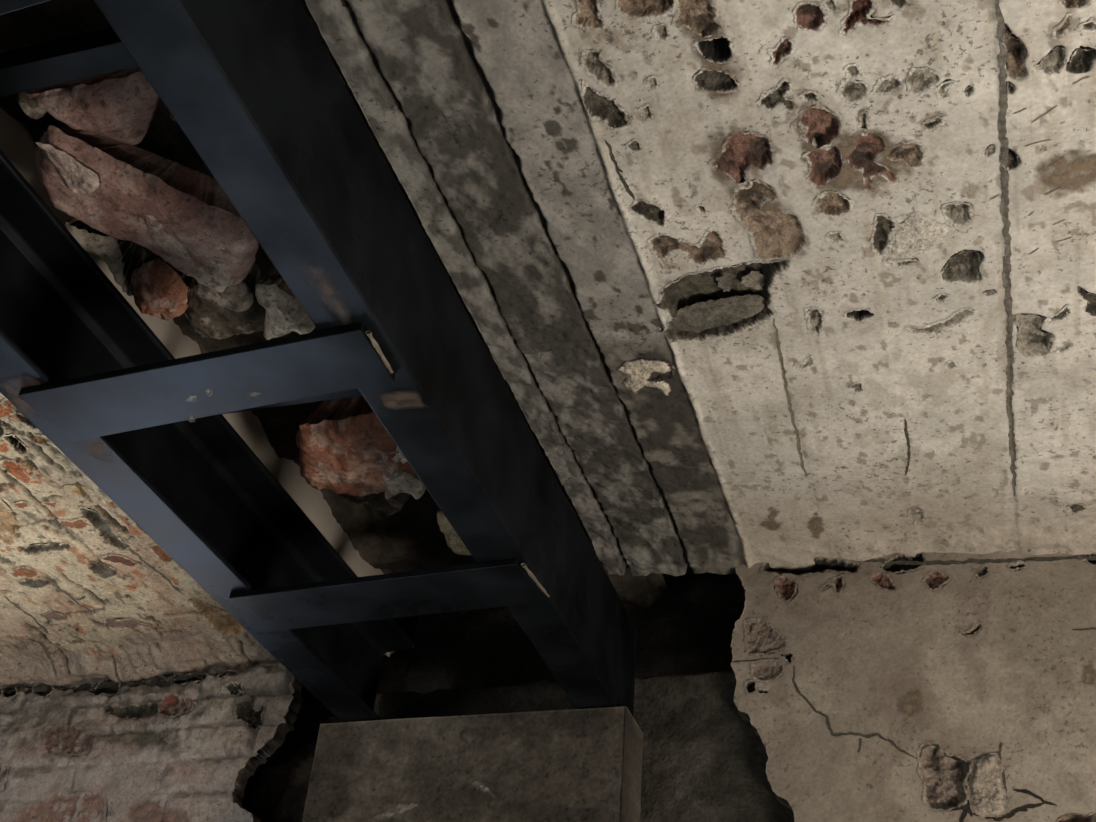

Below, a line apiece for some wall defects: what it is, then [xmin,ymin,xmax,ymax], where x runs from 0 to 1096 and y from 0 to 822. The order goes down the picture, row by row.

crack [989,0,1073,496]
flaking render [0,441,47,484]
flaking render [0,498,30,546]
flaking render [57,518,93,530]
flaking render [99,554,140,568]
flaking render [149,544,174,563]
flaking render [0,566,41,579]
flaking render [103,617,166,632]
crack [733,658,1057,822]
spalling [1057,812,1096,822]